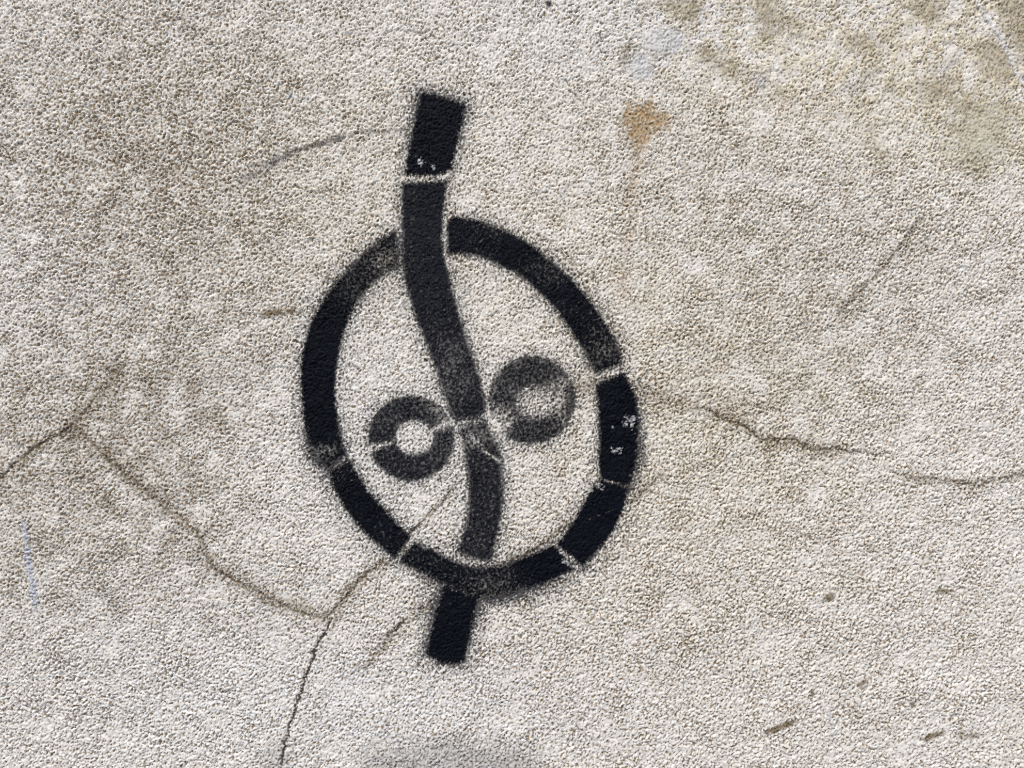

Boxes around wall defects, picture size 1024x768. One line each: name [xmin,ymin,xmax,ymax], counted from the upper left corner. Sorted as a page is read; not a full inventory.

rust [623,104,668,143]
crack [705,409,886,455]
crack [1,374,381,765]